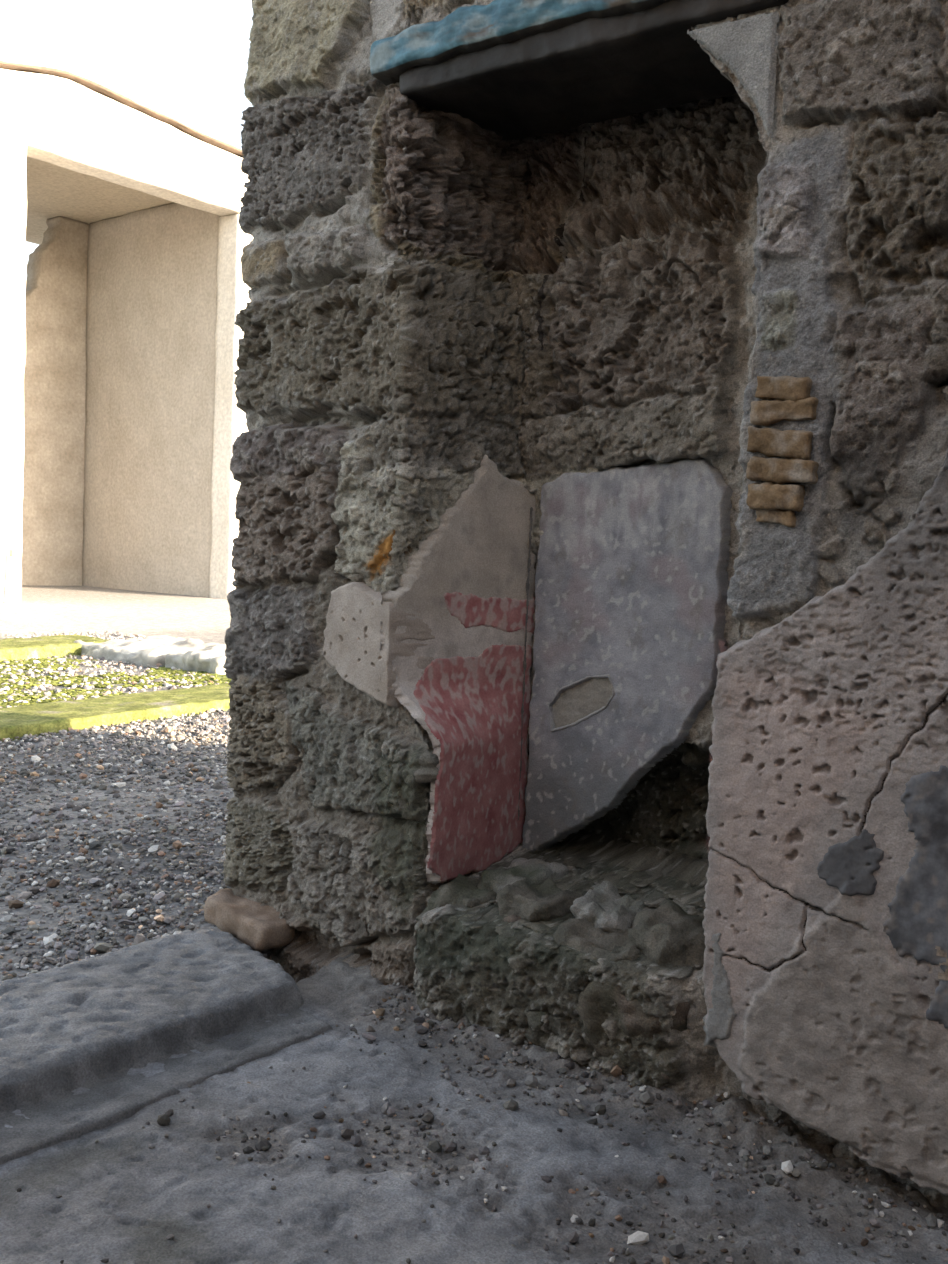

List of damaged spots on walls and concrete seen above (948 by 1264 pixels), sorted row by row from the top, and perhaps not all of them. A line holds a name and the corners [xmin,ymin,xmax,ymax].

peeling [413,592,535,883]
spalling [549,674,615,732]
crack [712,849,847,972]